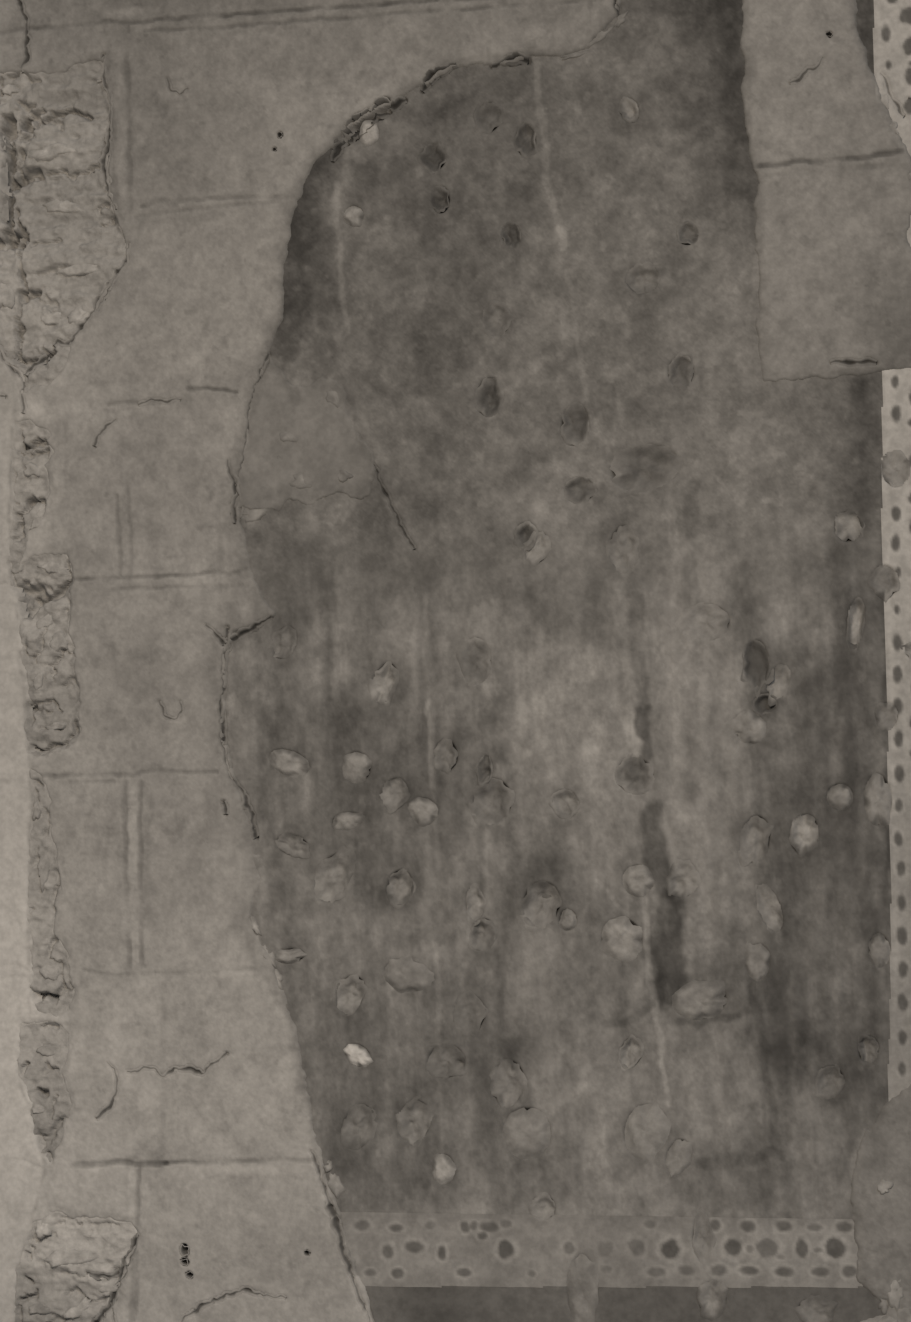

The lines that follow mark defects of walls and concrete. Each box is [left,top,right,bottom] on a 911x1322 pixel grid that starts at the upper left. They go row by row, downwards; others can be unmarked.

crack [0,0,32,96]
spalling [0,61,126,392]
crack [157,701,184,721]
crack [204,615,273,840]
hole [740,640,777,716]
spalling [9,419,81,1162]
crack [96,1051,228,1121]
peeling [323,1160,347,1199]
spalling [14,1211,137,1322]
crack [179,1286,286,1322]